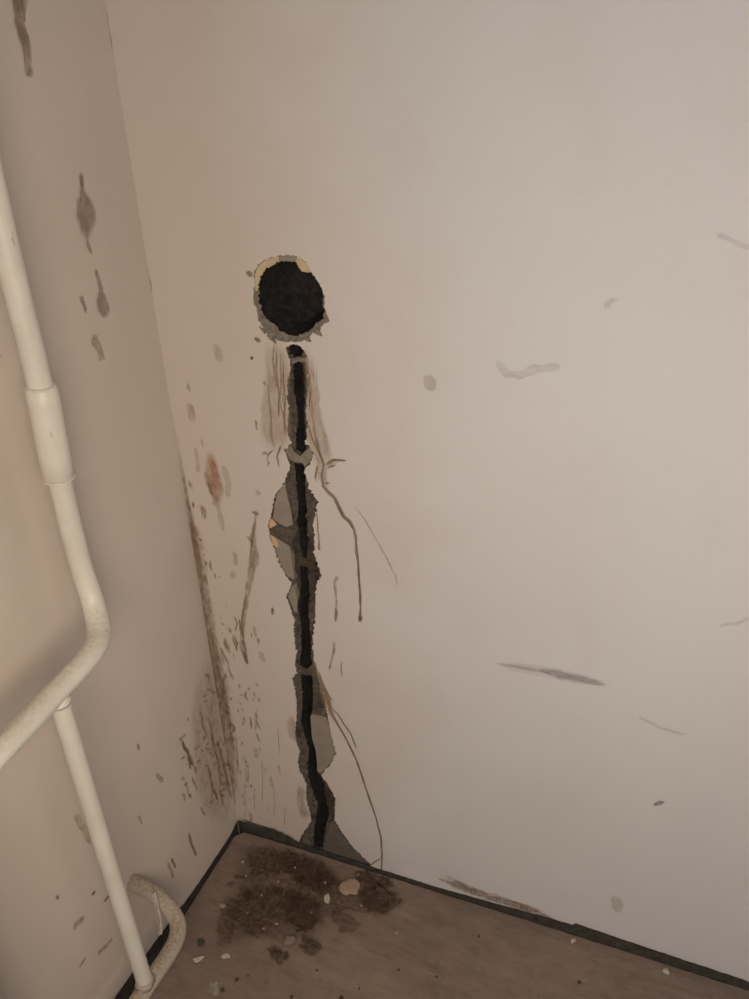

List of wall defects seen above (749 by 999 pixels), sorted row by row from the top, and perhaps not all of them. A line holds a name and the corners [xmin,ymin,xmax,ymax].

spalling [246,255,329,847]
crack [322,485,391,622]
leakage [199,512,263,813]
leakage [245,807,291,838]
crack [313,662,383,870]